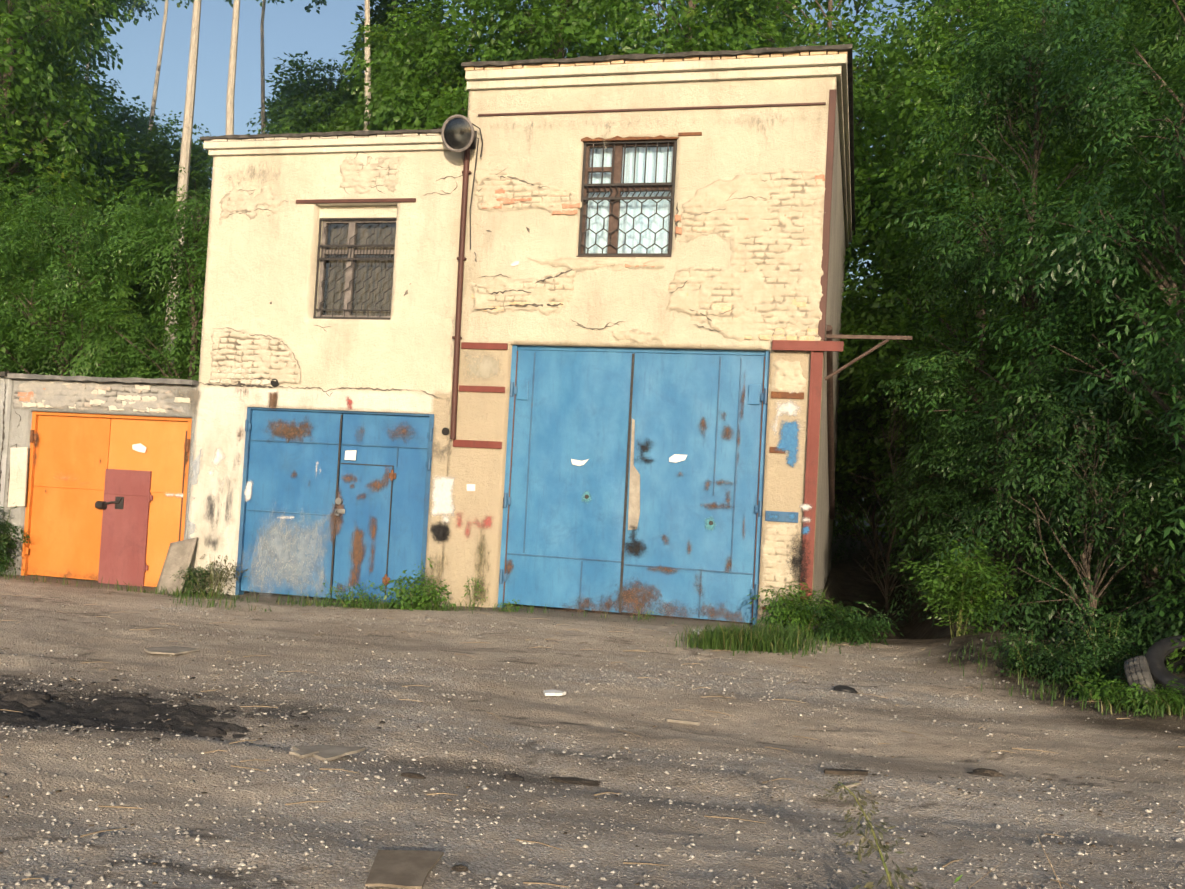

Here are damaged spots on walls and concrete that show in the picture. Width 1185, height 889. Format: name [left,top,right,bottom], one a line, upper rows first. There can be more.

flaking render [340,155,407,194]
flaking render [469,168,826,343]
flaking render [208,329,302,385]
flaking render [771,358,807,393]
corrosion [704,480,732,509]
corrosion [331,471,388,590]
flaking render [758,522,801,607]